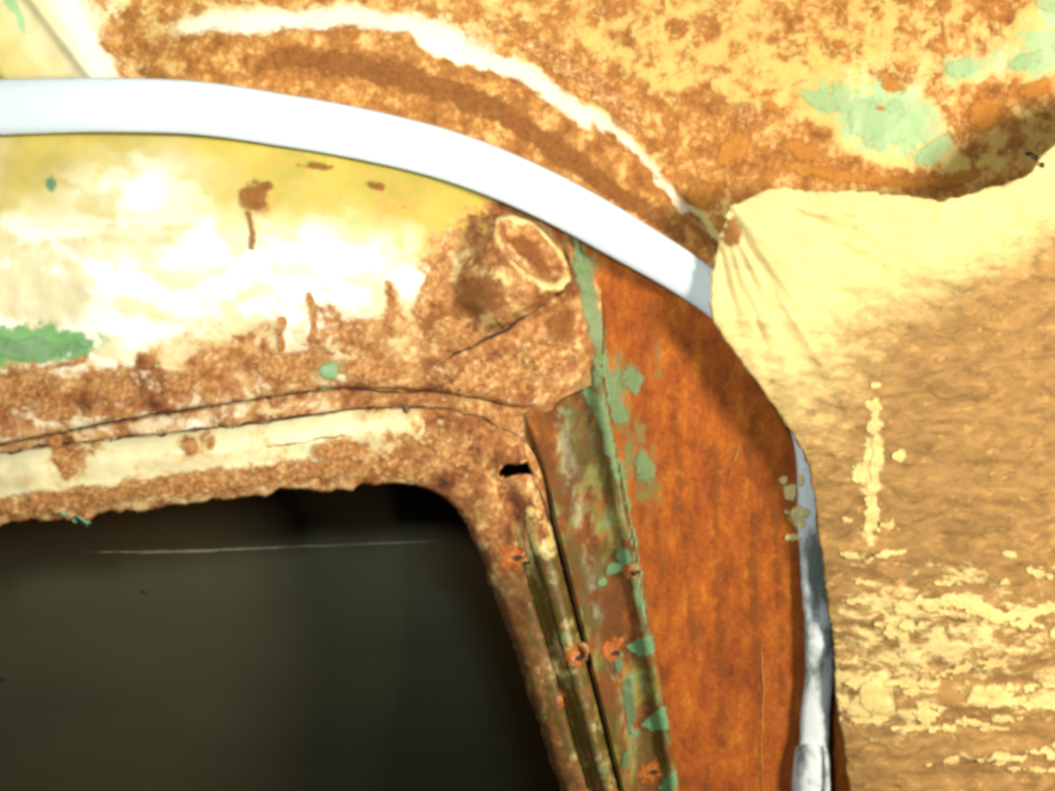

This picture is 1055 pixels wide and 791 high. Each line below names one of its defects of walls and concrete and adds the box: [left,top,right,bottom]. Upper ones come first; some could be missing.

peeling [947,56,973,77]
rust [271,36,686,243]
peeling [804,81,953,166]
rust [239,180,273,250]
rust [513,235,553,273]
rust [243,291,396,386]
rust [414,256,503,346]
rust [439,309,583,401]
rust [0,425,487,517]
peeling [572,254,655,611]
peeling [615,633,669,771]
peeling [659,770,678,791]